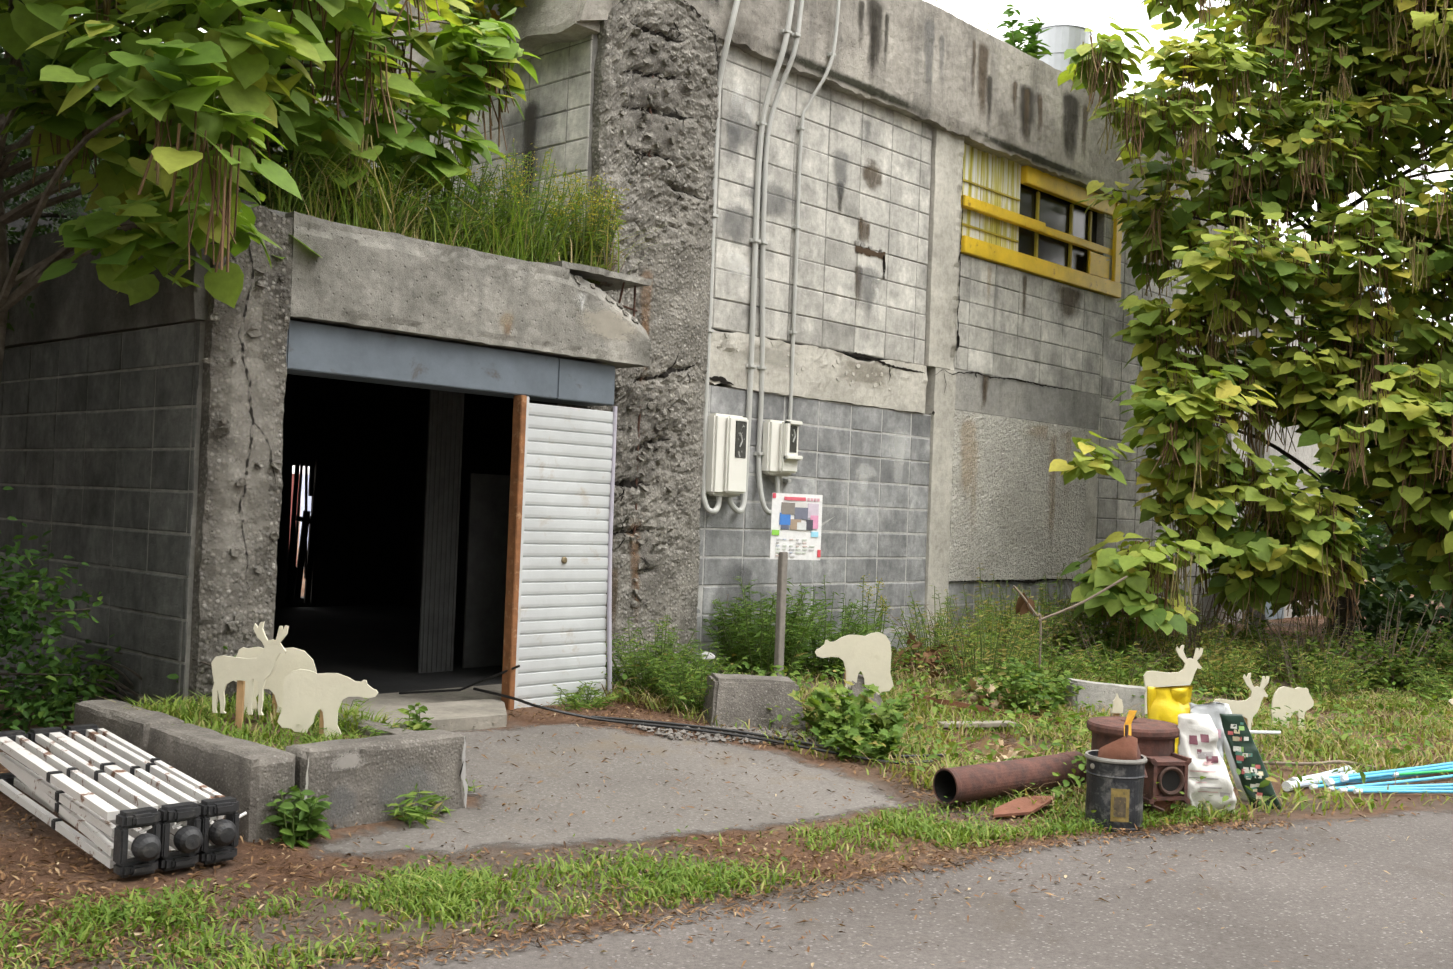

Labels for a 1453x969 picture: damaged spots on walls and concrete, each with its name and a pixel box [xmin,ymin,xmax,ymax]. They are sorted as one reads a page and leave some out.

leakage [859,0,889,66]
spalling [619,27,694,166]
leakage [973,41,992,114]
leakage [1013,81,1042,136]
leakage [864,162,881,187]
spalling [574,275,639,340]
crack [238,245,276,589]
spalling [615,377,674,607]